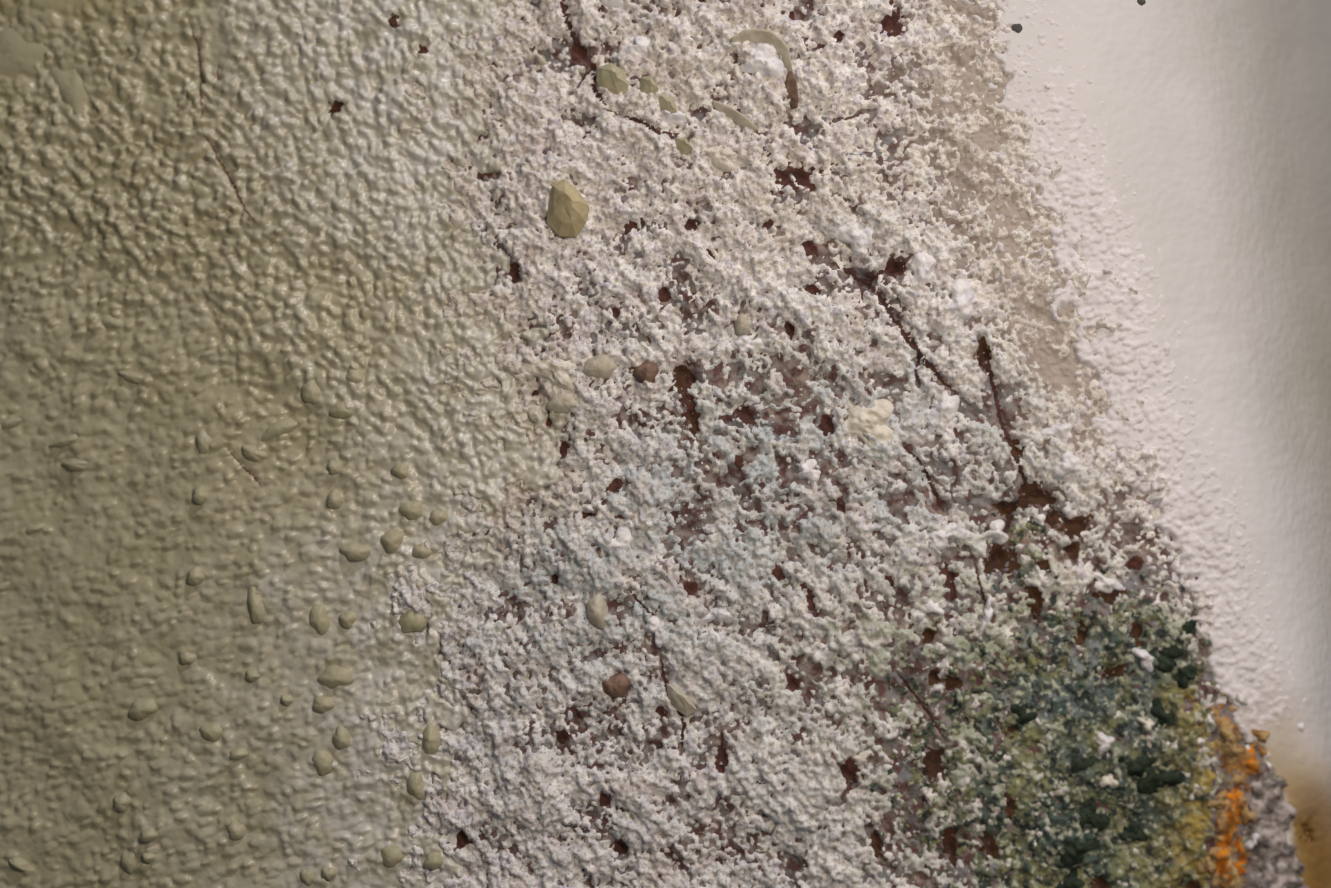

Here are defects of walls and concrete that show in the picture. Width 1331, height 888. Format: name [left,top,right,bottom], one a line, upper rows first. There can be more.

spalling [328,100,346,116]
spalling [388,13,400,29]
damp [353,0,1331,888]
spalling [430,0,1313,888]
rust [1196,703,1270,888]